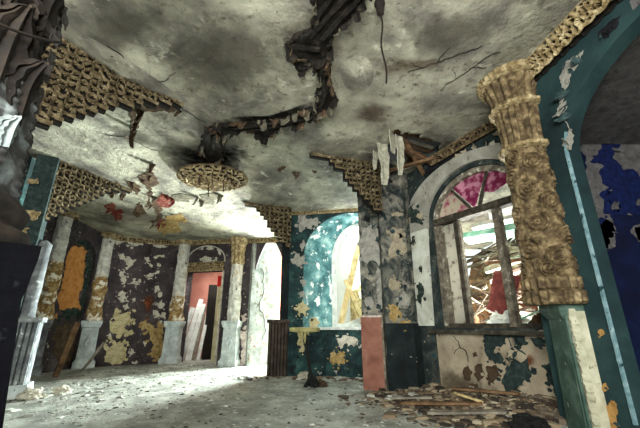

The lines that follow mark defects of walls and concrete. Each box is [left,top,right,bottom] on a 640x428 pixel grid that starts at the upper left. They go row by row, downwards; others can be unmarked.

peeling [24,4,69,147]
spalling [197,0,372,165]
crack [408,46,500,91]
peeling [552,50,640,250]
spalling [103,244,169,365]
peeling [291,240,308,269]
spalling [294,279,320,327]
peeling [294,215,321,232]
spalling [357,224,426,332]
spalling [386,202,424,259]
peeling [327,333,362,369]
peeling [463,330,556,396]